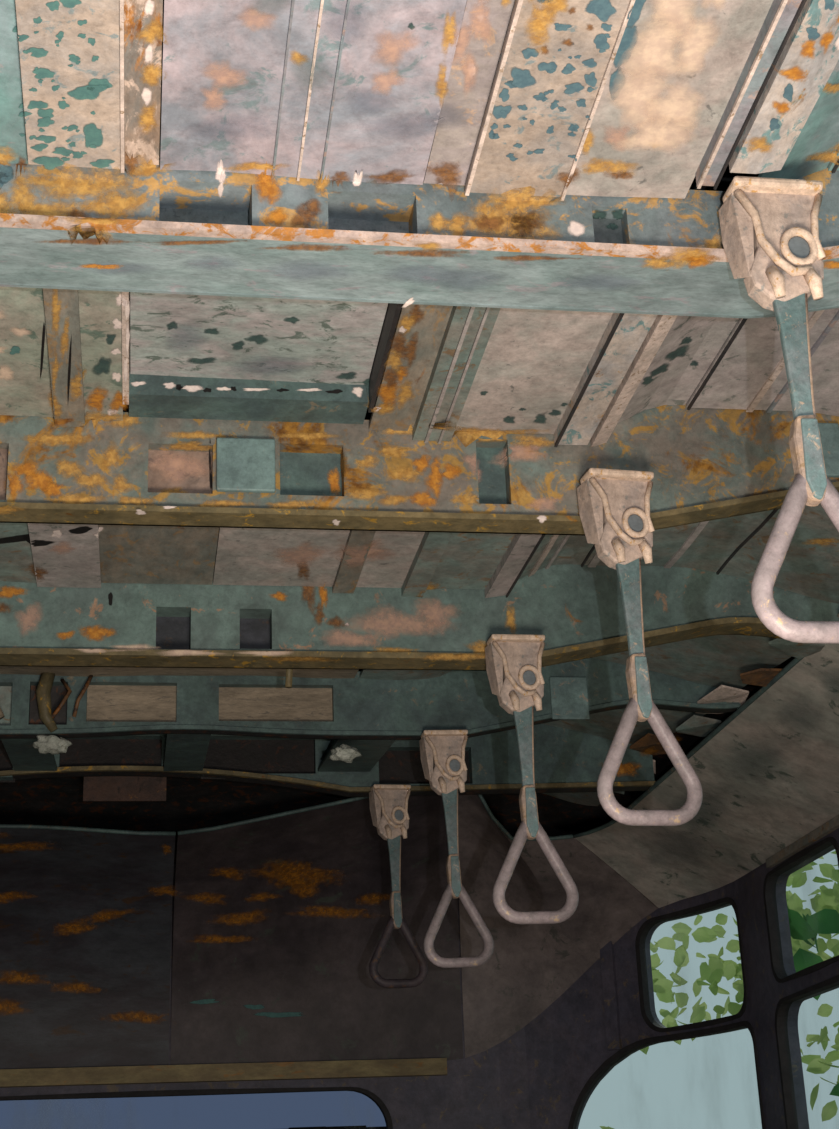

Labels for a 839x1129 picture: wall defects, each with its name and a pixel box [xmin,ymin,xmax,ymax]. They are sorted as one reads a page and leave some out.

peeling [13,0,115,170]
peeling [489,0,723,149]
peeling [506,143,545,161]
rust [560,132,631,187]
rust [0,151,169,245]
rust [236,162,408,226]
rust [431,186,556,239]
rust [386,243,455,257]
rust [372,298,423,413]
rust [0,447,150,514]
rust [156,432,221,493]
rust [329,422,551,506]